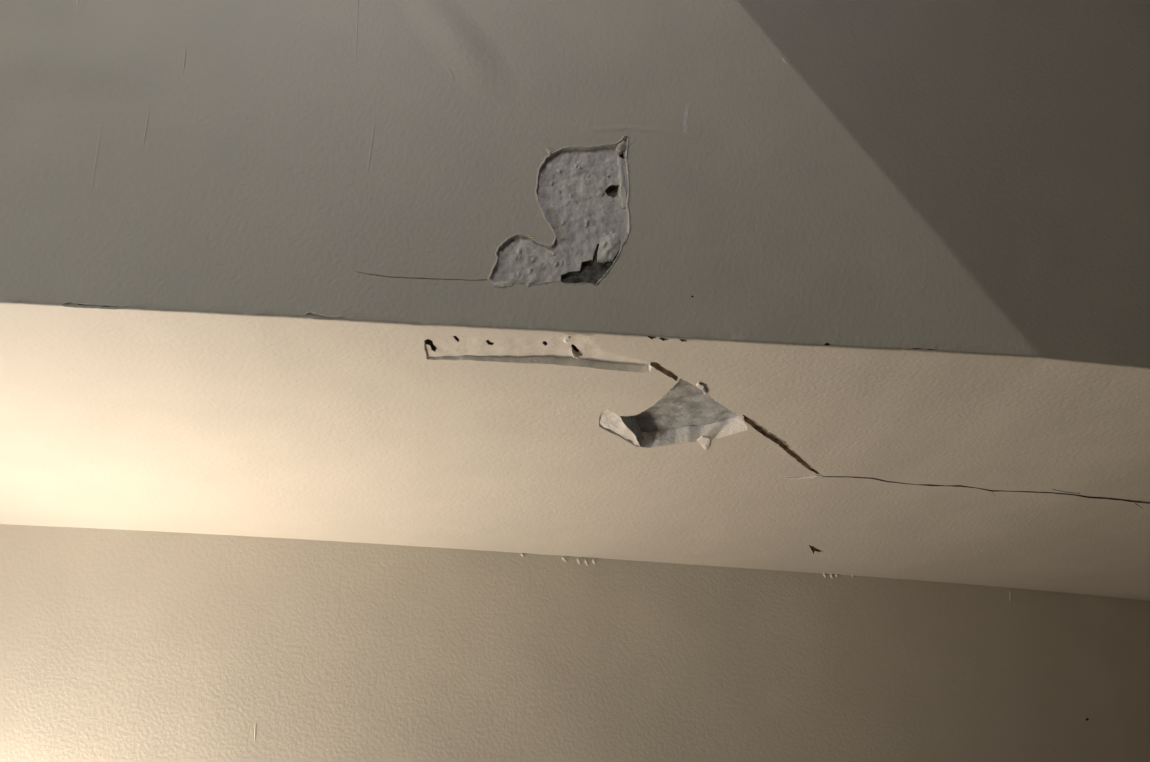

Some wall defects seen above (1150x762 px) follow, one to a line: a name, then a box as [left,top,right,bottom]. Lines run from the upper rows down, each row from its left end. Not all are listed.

spalling [487,135,631,287]
spalling [424,336,652,373]
crack [650,362,679,381]
spalling [599,379,747,451]
crack [743,415,1150,509]